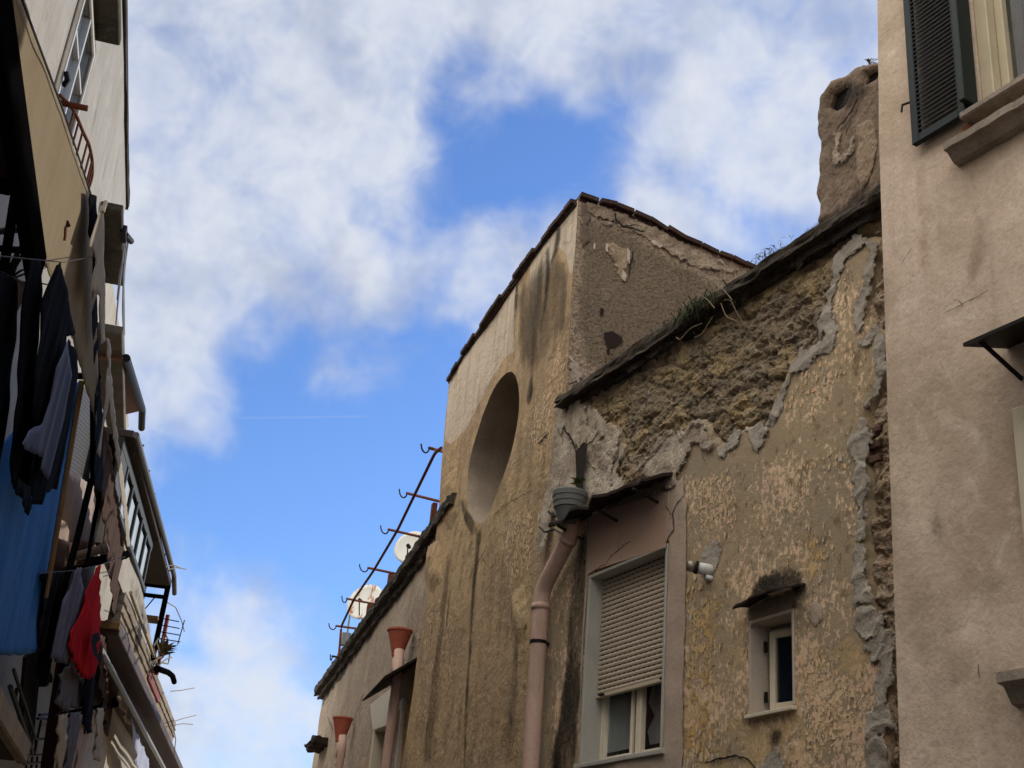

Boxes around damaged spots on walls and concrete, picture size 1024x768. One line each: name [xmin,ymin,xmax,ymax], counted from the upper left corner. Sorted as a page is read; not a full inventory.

damp [502,224,565,356]
flaking render [580,204,633,282]
crack [615,213,644,232]
flaking render [499,312,626,591]
crack [665,495,684,551]
damp [461,502,481,719]